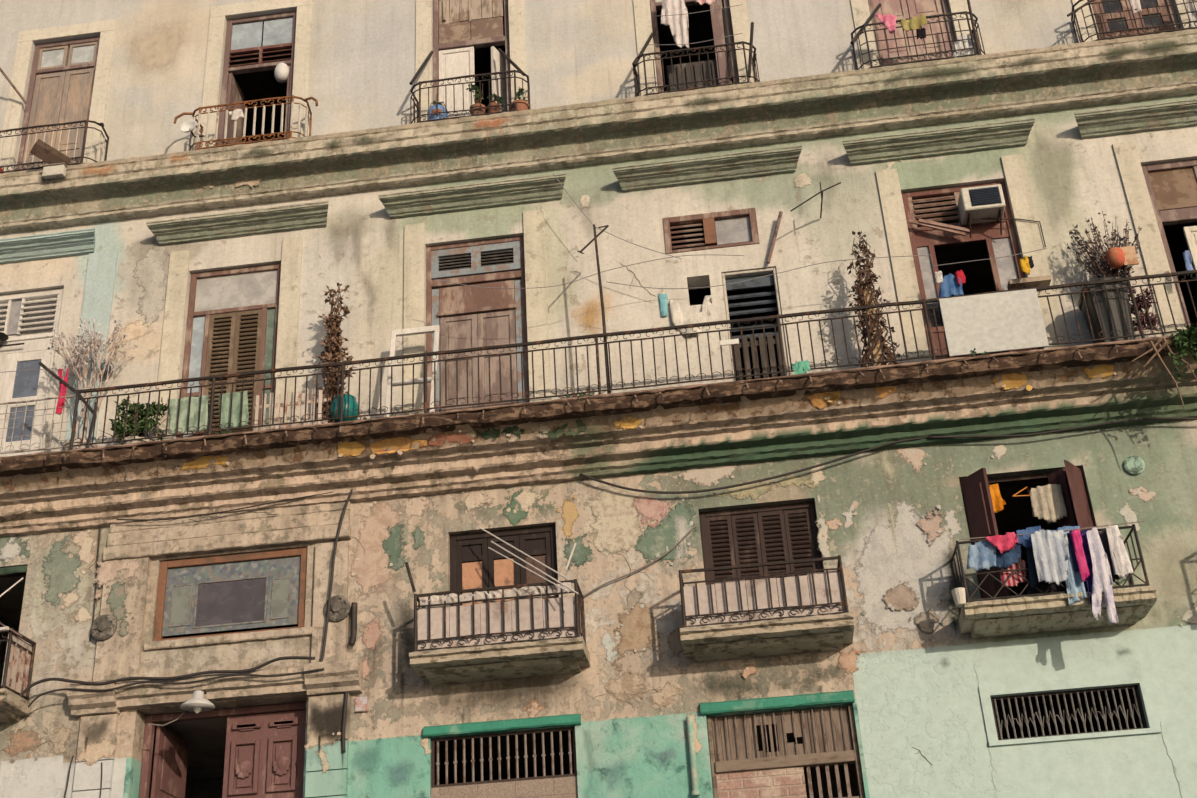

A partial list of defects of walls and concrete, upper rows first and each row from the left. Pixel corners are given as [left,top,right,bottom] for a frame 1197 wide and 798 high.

peeling [112,246,170,352]
peeling [337,419,587,459]
spalling [614,415,642,429]
spalling [806,391,842,408]
peeling [895,447,927,475]
peeling [0,530,140,637]
peeling [349,496,430,597]
peeling [557,485,697,569]
peeling [679,462,859,565]
peeling [851,497,962,636]
peeling [601,588,683,703]
peeling [4,726,117,766]